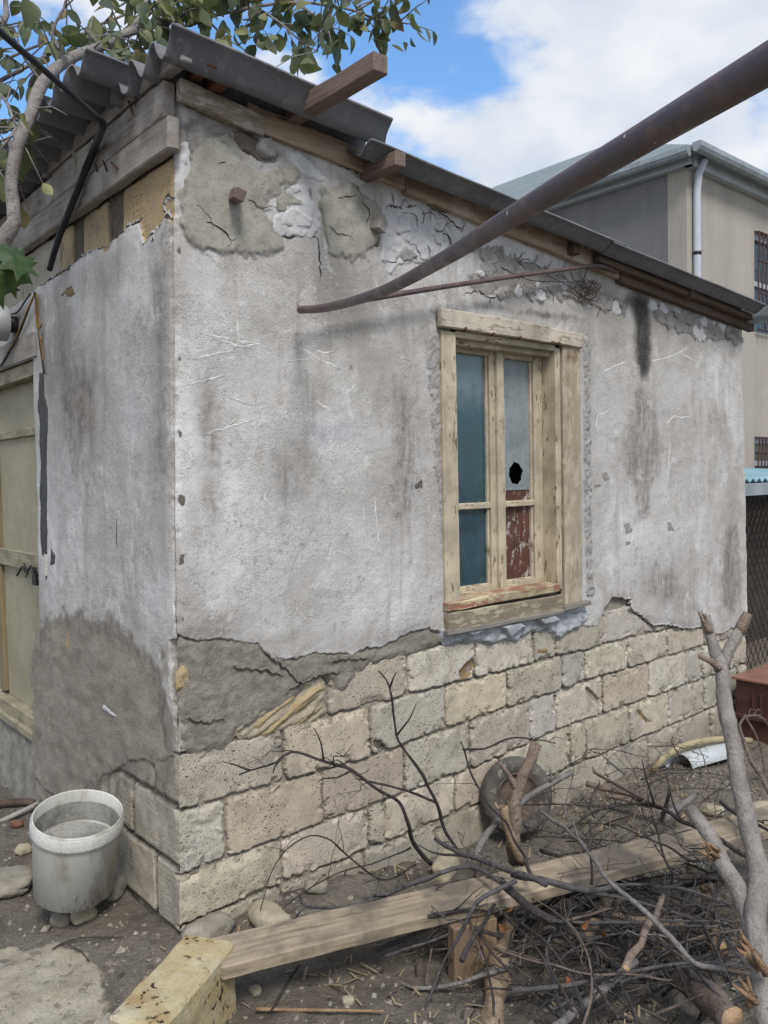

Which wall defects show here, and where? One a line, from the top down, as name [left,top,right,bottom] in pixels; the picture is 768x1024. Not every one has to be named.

peeling [173,113,365,239]
peeling [374,199,470,275]
crack [386,192,462,232]
peeling [470,244,624,316]
peeling [647,299,744,346]
water stain [38,373,55,565]
spalling [425,332,443,553]